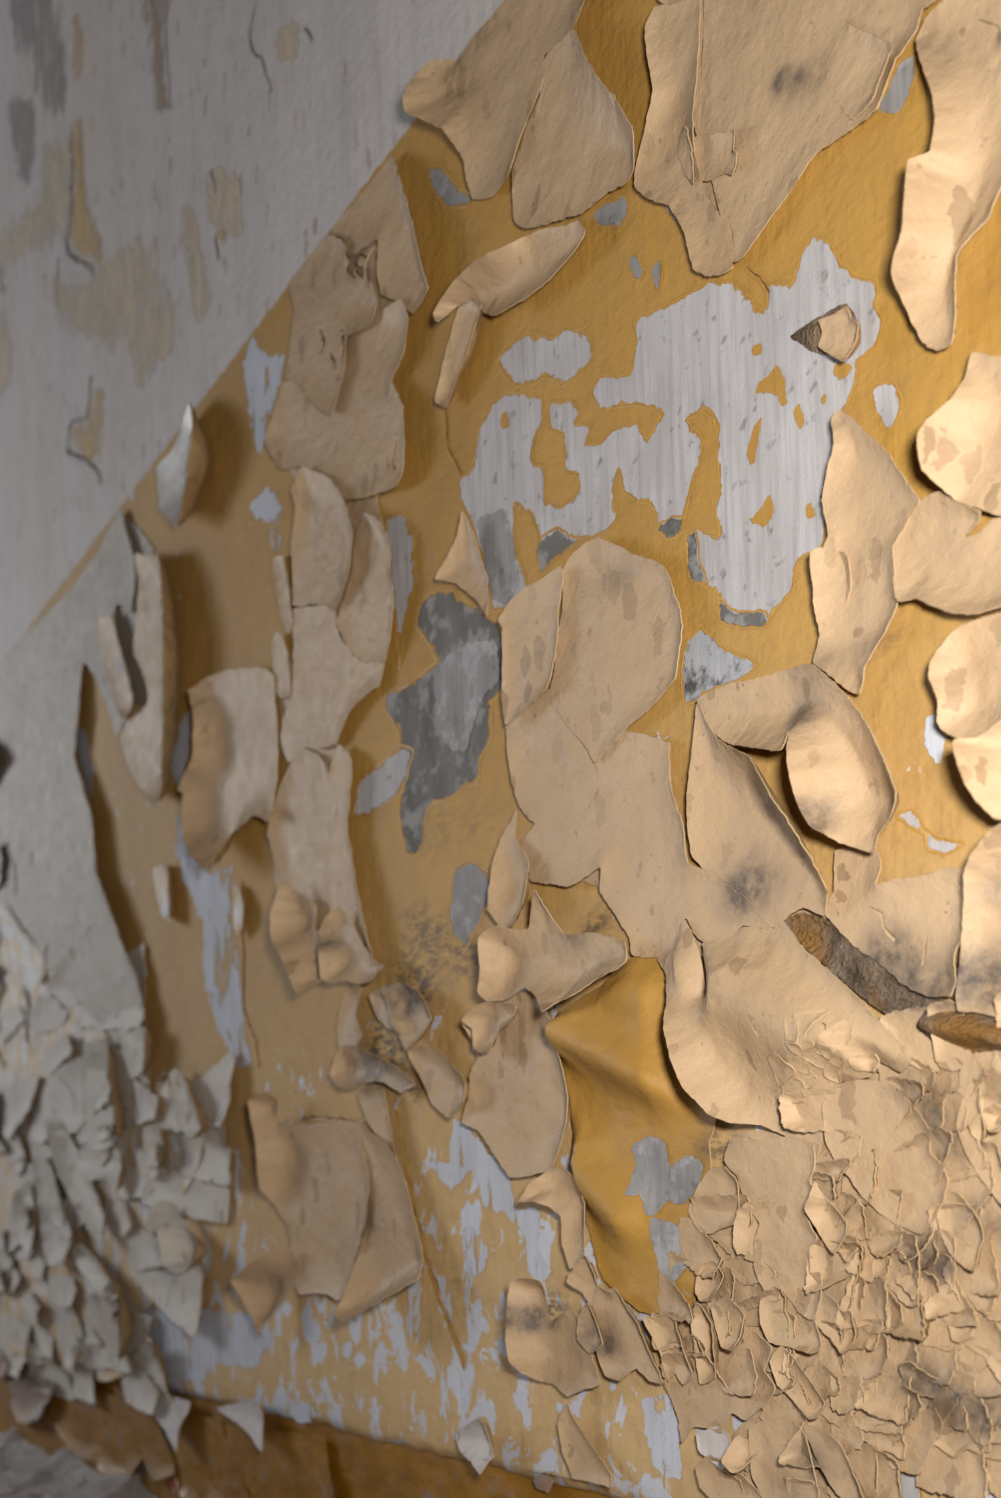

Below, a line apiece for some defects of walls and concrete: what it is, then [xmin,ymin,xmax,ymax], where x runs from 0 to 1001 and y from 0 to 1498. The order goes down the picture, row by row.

peeling [0,510,569,1498]
flaking render [243,0,1001,1498]